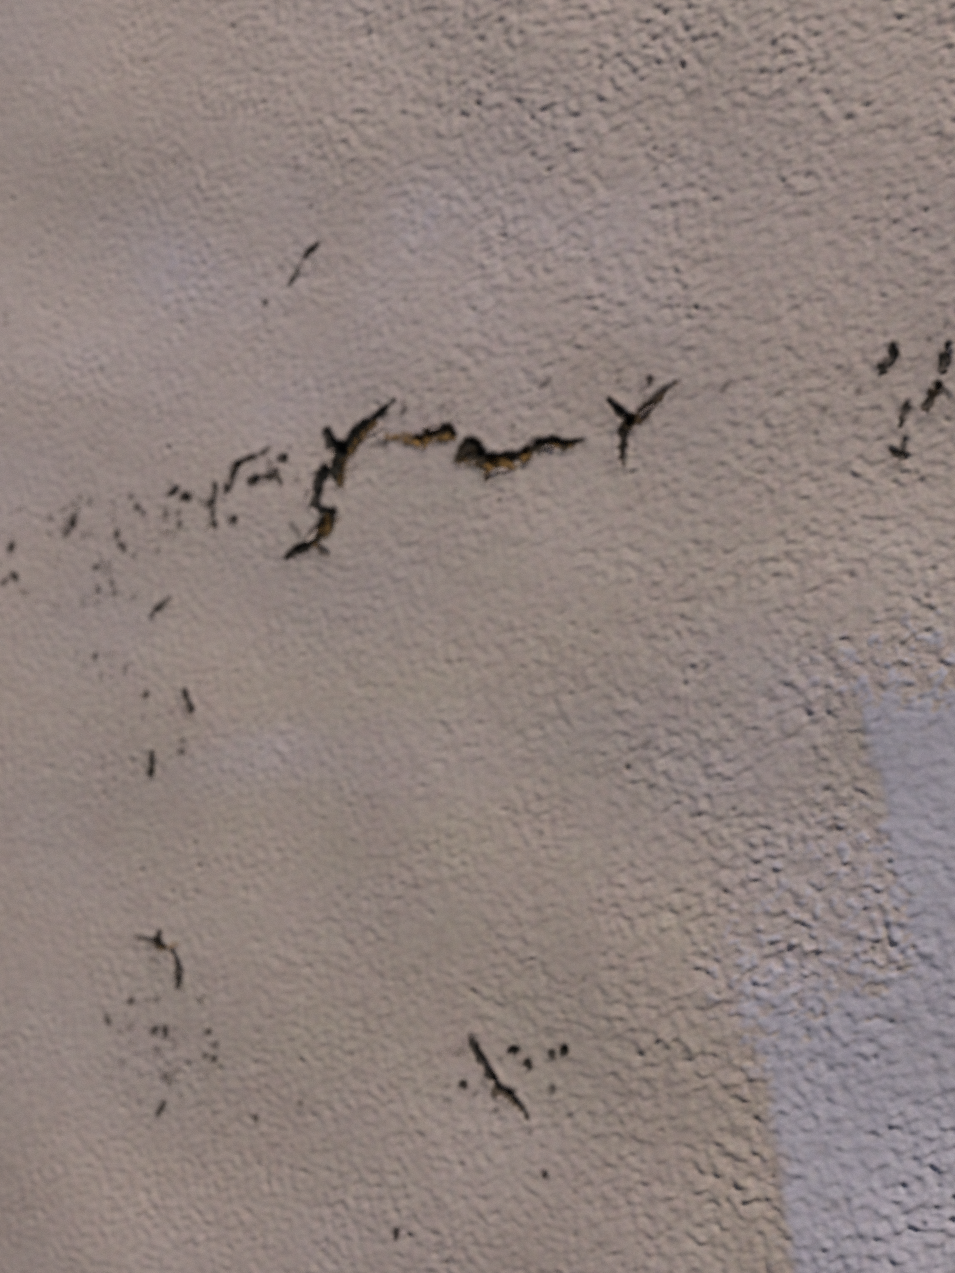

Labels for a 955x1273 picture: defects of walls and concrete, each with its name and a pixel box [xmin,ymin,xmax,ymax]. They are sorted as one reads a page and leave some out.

crack [289,242,319,285]
crack [877,342,900,374]
crack [223,455,257,494]
crack [284,397,396,560]
crack [411,423,583,481]
crack [606,381,678,465]
crack [889,342,951,460]
crack [150,601,167,617]
crack [135,930,182,988]
crack [469,1036,529,1120]